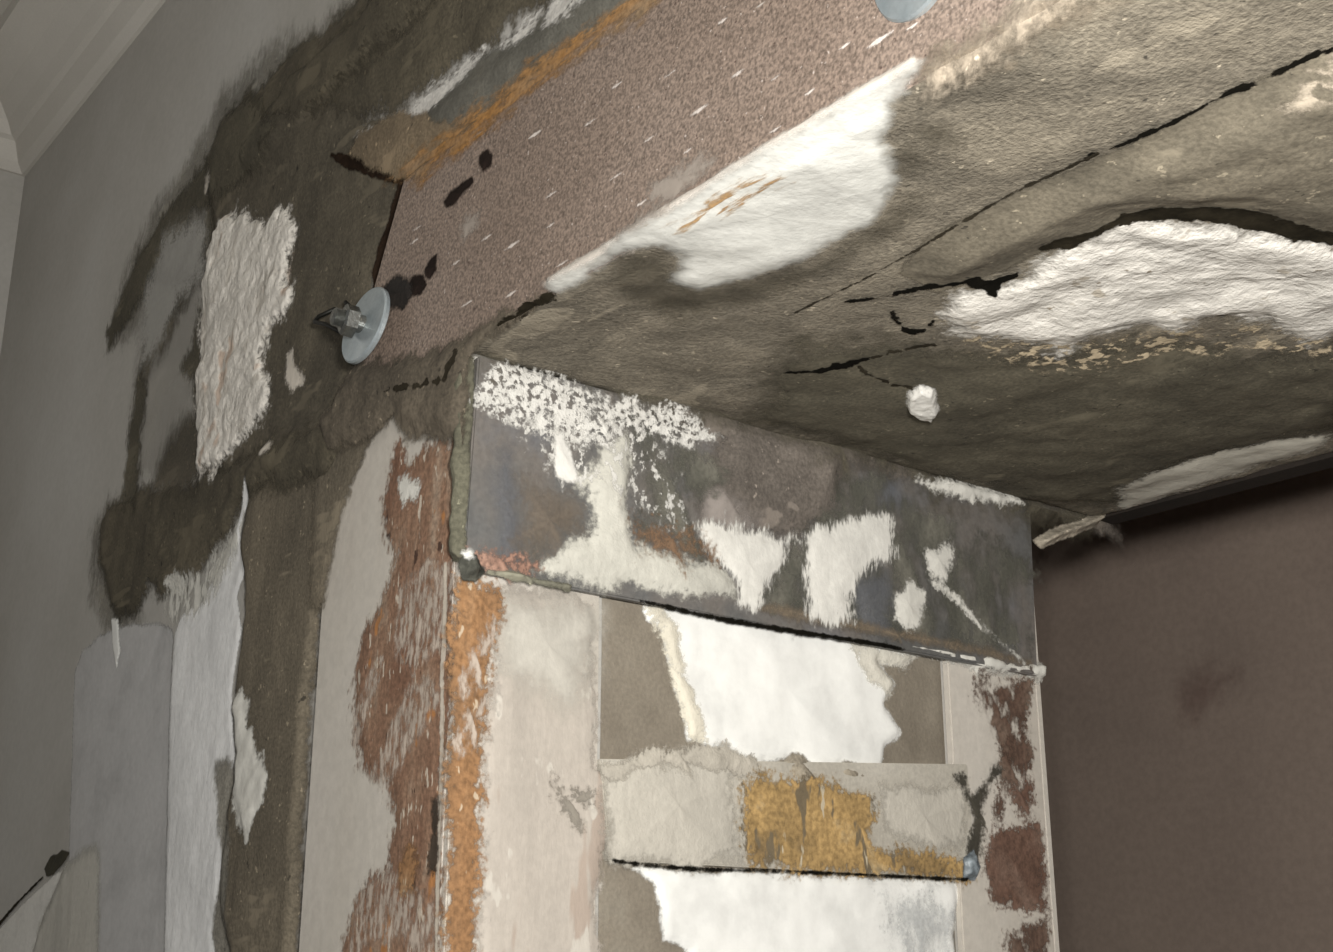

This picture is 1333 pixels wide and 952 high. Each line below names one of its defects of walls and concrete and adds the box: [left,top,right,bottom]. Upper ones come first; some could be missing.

rust [392,0,657,186]
spalling [1287,53,1333,113]
peeling [140,204,305,480]
crack [785,47,1333,390]
spalling [936,220,1333,374]
rust [342,438,545,952]
peeling [644,605,708,743]
peeling [850,643,916,700]
rust [738,668,1052,952]